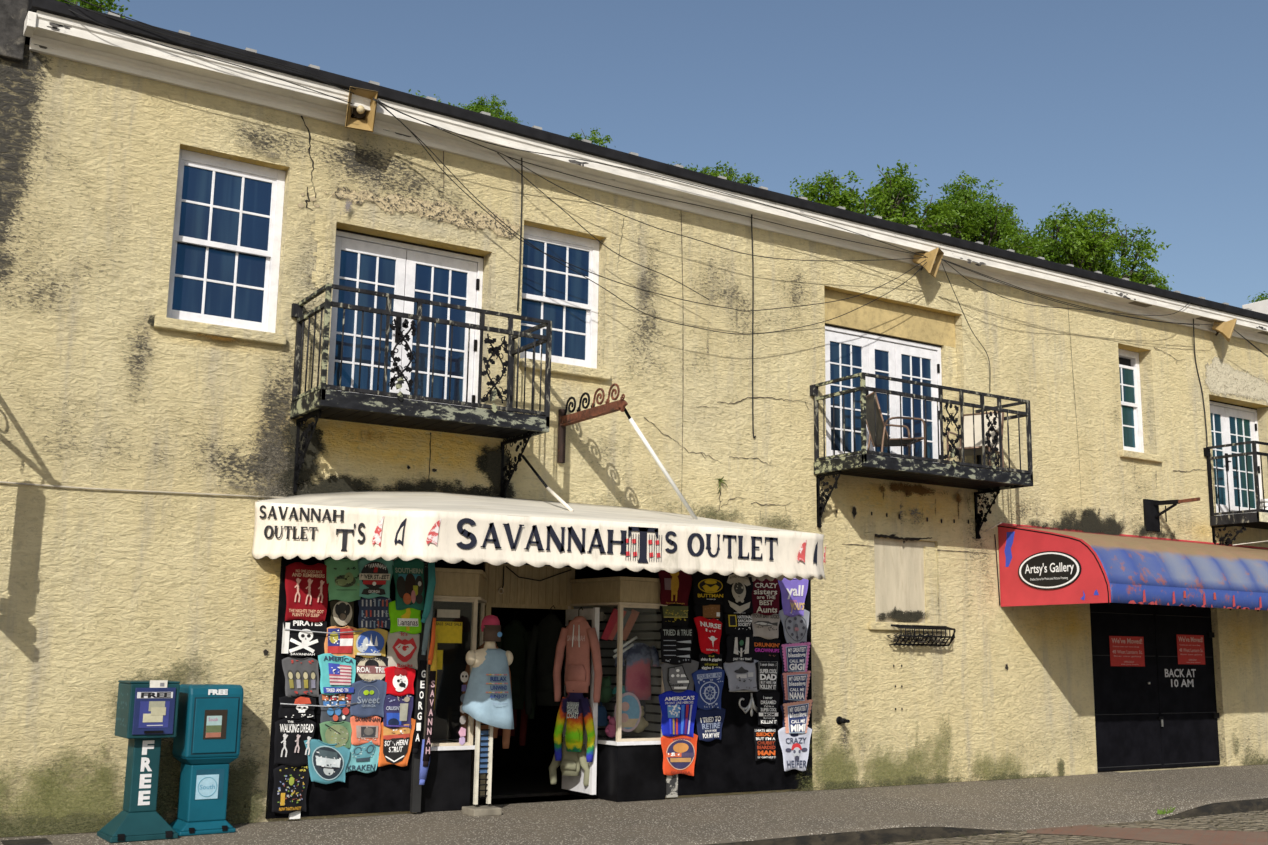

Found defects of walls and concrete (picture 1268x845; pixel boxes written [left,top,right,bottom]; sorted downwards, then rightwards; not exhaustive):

crack [298,116,320,211]
damp [1029,508,1175,540]